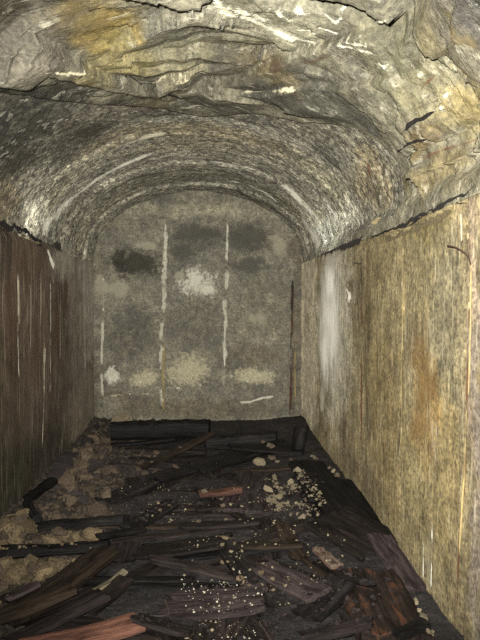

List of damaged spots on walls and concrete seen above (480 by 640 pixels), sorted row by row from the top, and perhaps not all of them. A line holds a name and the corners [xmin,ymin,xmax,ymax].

crack [397,111,435,152]
damp [94,223,287,312]
damp [319,264,351,412]
rust [457,441,466,600]